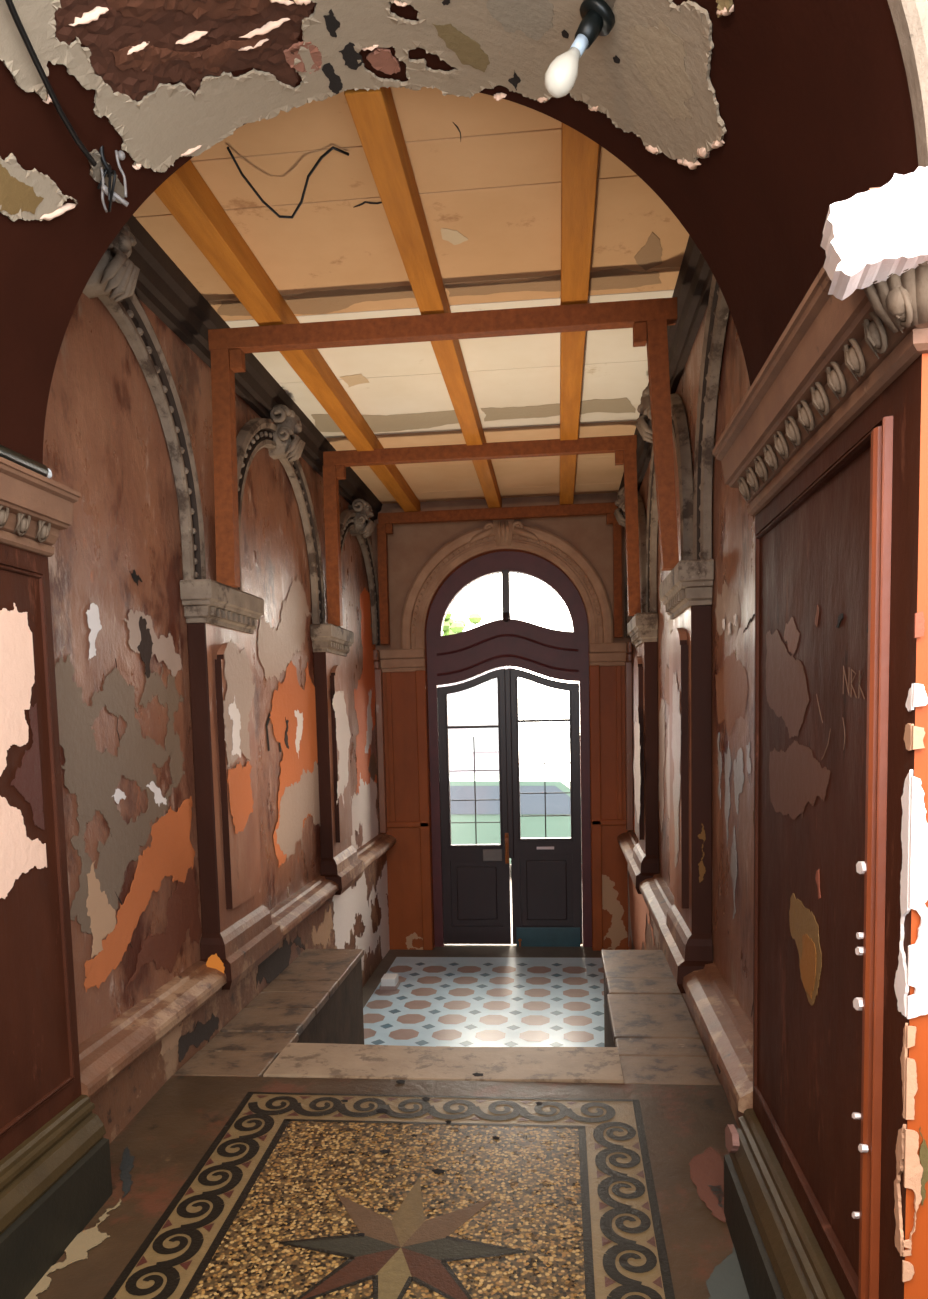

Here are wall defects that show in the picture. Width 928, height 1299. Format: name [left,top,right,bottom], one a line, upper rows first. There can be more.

peeling [40,203,77,221]
spalling [54,0,401,100]
flaking render [494,72,521,101]
peeling [677,139,725,170]
flaking render [0,603,35,776]
flaking render [0,796,47,899]
peeling [55,616,195,992]
peeling [223,577,320,867]
peeling [332,587,378,850]
peeling [766,617,831,820]
flaking render [904,683,928,751]
flaking render [894,770,928,1282]